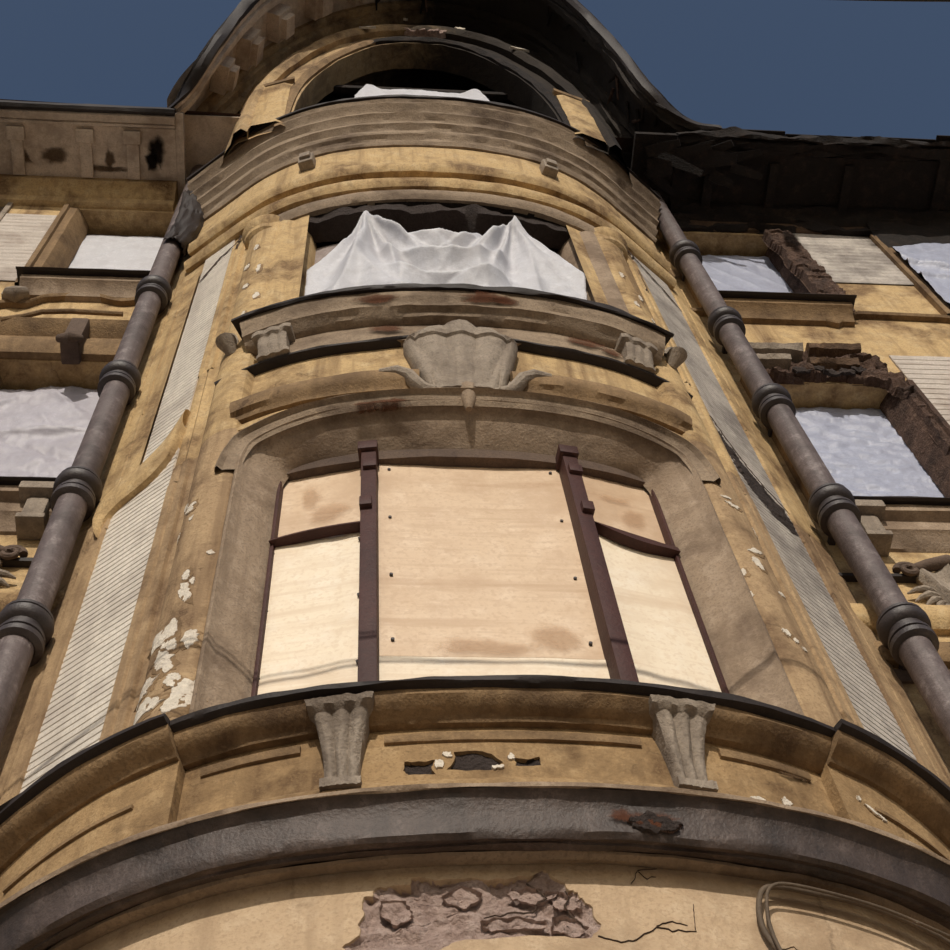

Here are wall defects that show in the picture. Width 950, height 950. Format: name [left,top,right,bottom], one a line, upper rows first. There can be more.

spalling [762,229,846,295]
spalling [749,342,914,401]
peeling [184,499,199,522]
peeling [178,567,196,605]
peeling [133,617,204,725]
peeling [404,751,540,775]
rust [611,809,684,835]
crack [630,869,656,884]
spalling [344,871,601,950]
crack [598,904,697,943]